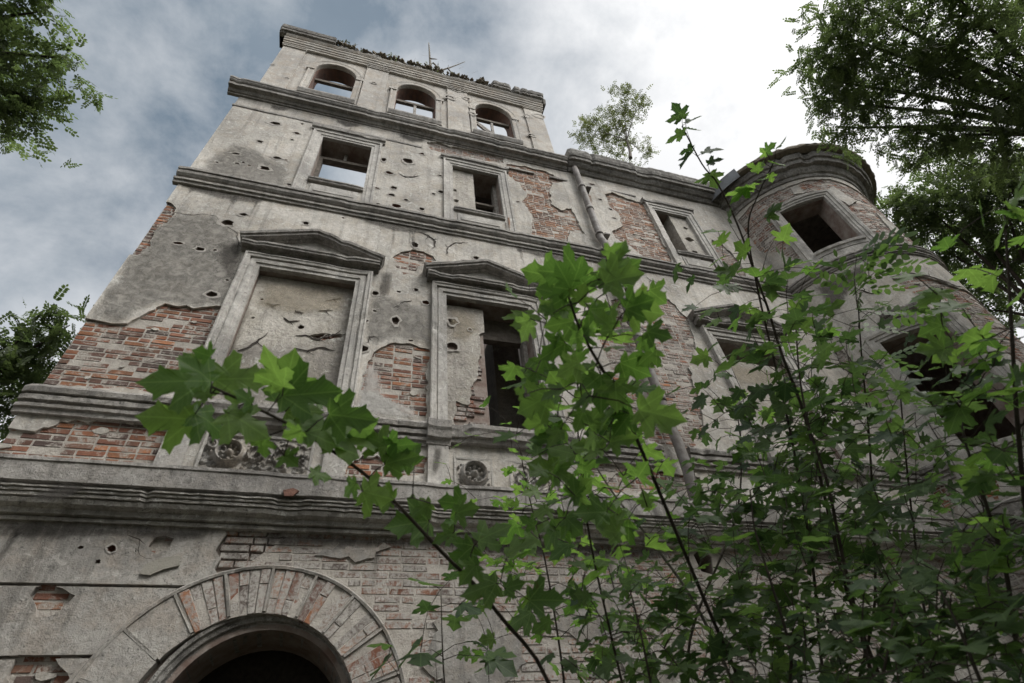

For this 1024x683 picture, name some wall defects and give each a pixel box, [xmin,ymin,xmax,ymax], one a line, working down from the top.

flaking render [393,240,435,275]
flaking render [375,143,584,241]
flaking render [588,183,671,262]
flaking render [43,203,252,392]
crack [238,298,378,354]
flaking render [361,287,430,421]
flaking render [454,354,487,425]
flaking render [0,420,167,464]
flaking render [25,585,89,618]
flaking render [218,531,1024,683]
flaking render [0,657,82,683]